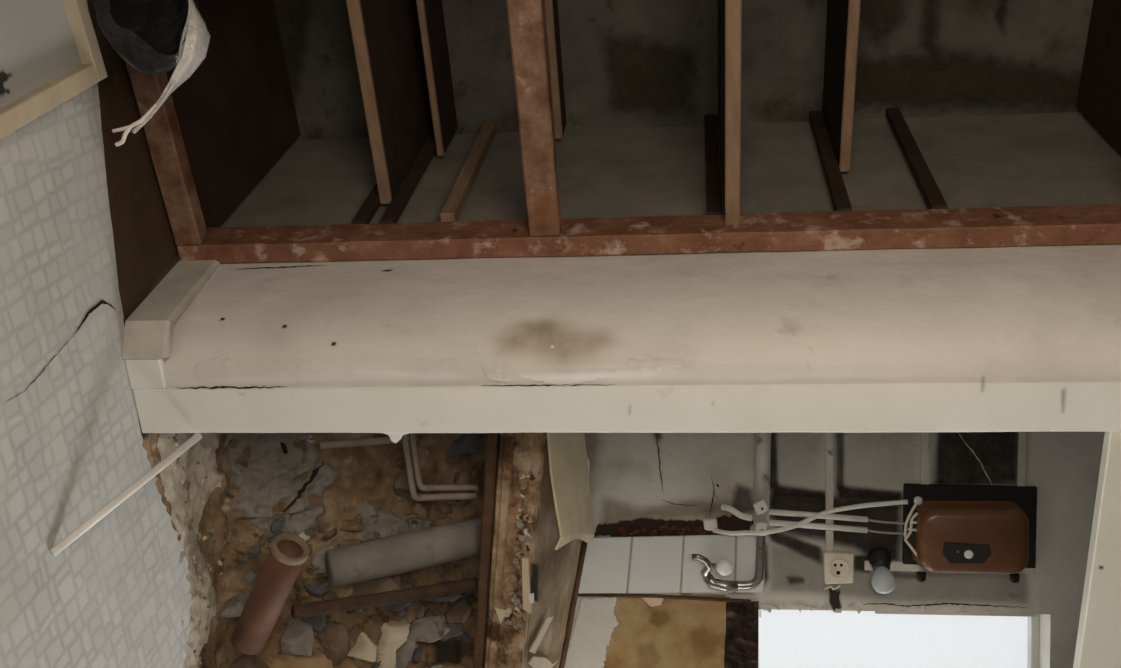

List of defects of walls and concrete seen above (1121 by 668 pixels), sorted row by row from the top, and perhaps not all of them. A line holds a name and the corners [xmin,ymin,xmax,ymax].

damp [473,304,637,386]
peeling [484,432,546,668]
flaking render [347,632,378,663]
flaking render [396,629,417,668]